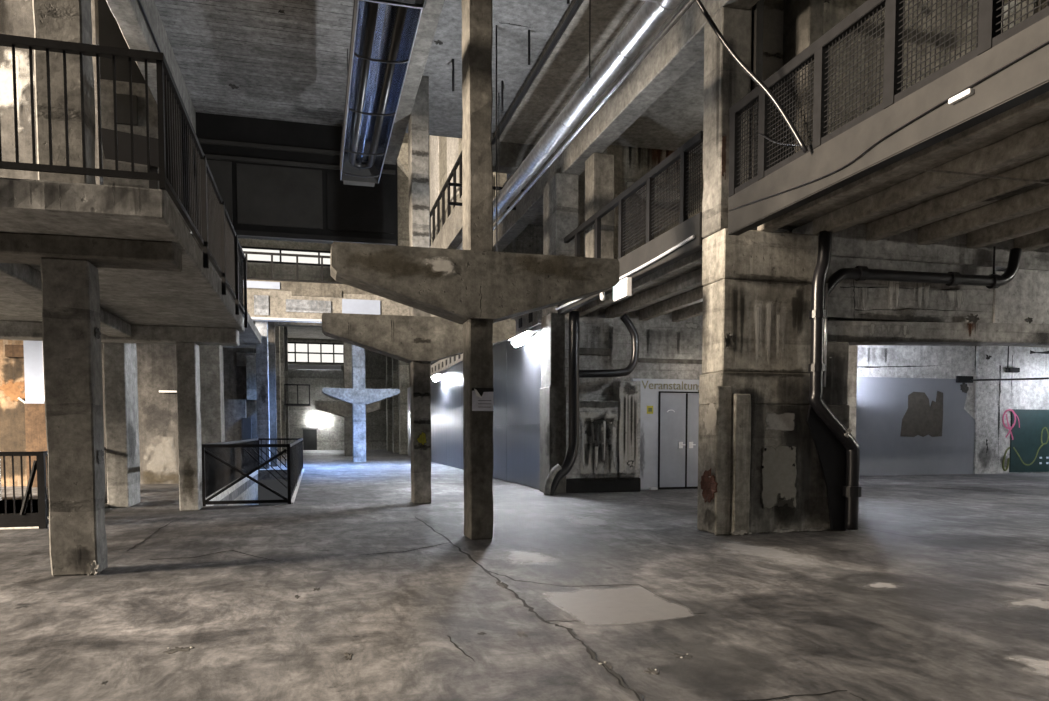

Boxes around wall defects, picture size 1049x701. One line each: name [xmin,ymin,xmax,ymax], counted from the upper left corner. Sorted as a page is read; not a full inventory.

crack [365,518,643,701]
crack [591,584,701,614]
crack [734,690,864,701]